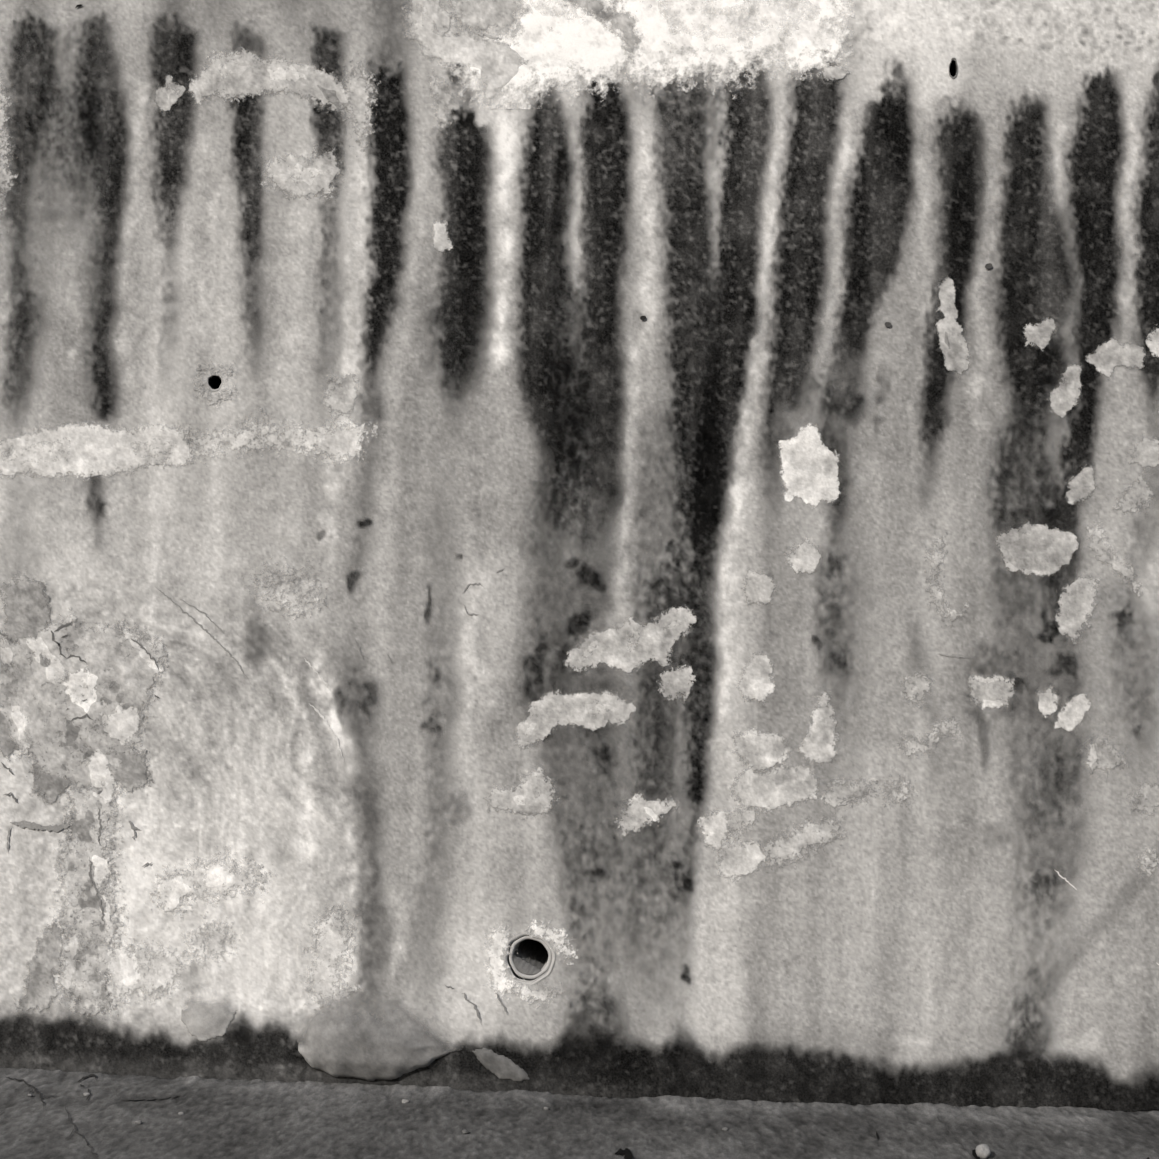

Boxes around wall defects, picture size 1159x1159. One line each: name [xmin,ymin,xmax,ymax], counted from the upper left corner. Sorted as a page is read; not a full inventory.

peeling [267,57,346,109]
peeling [291,159,324,185]
water stain [363,53,411,414]
water stain [436,63,490,390]
water stain [518,75,631,519]
water stain [658,56,772,576]
water stain [826,65,914,419]
water stain [996,69,1123,536]
peeling [1005,562,1051,577]
peeling [513,787,539,805]
peeling [644,800,673,823]
water stain [0,1001,1159,1112]